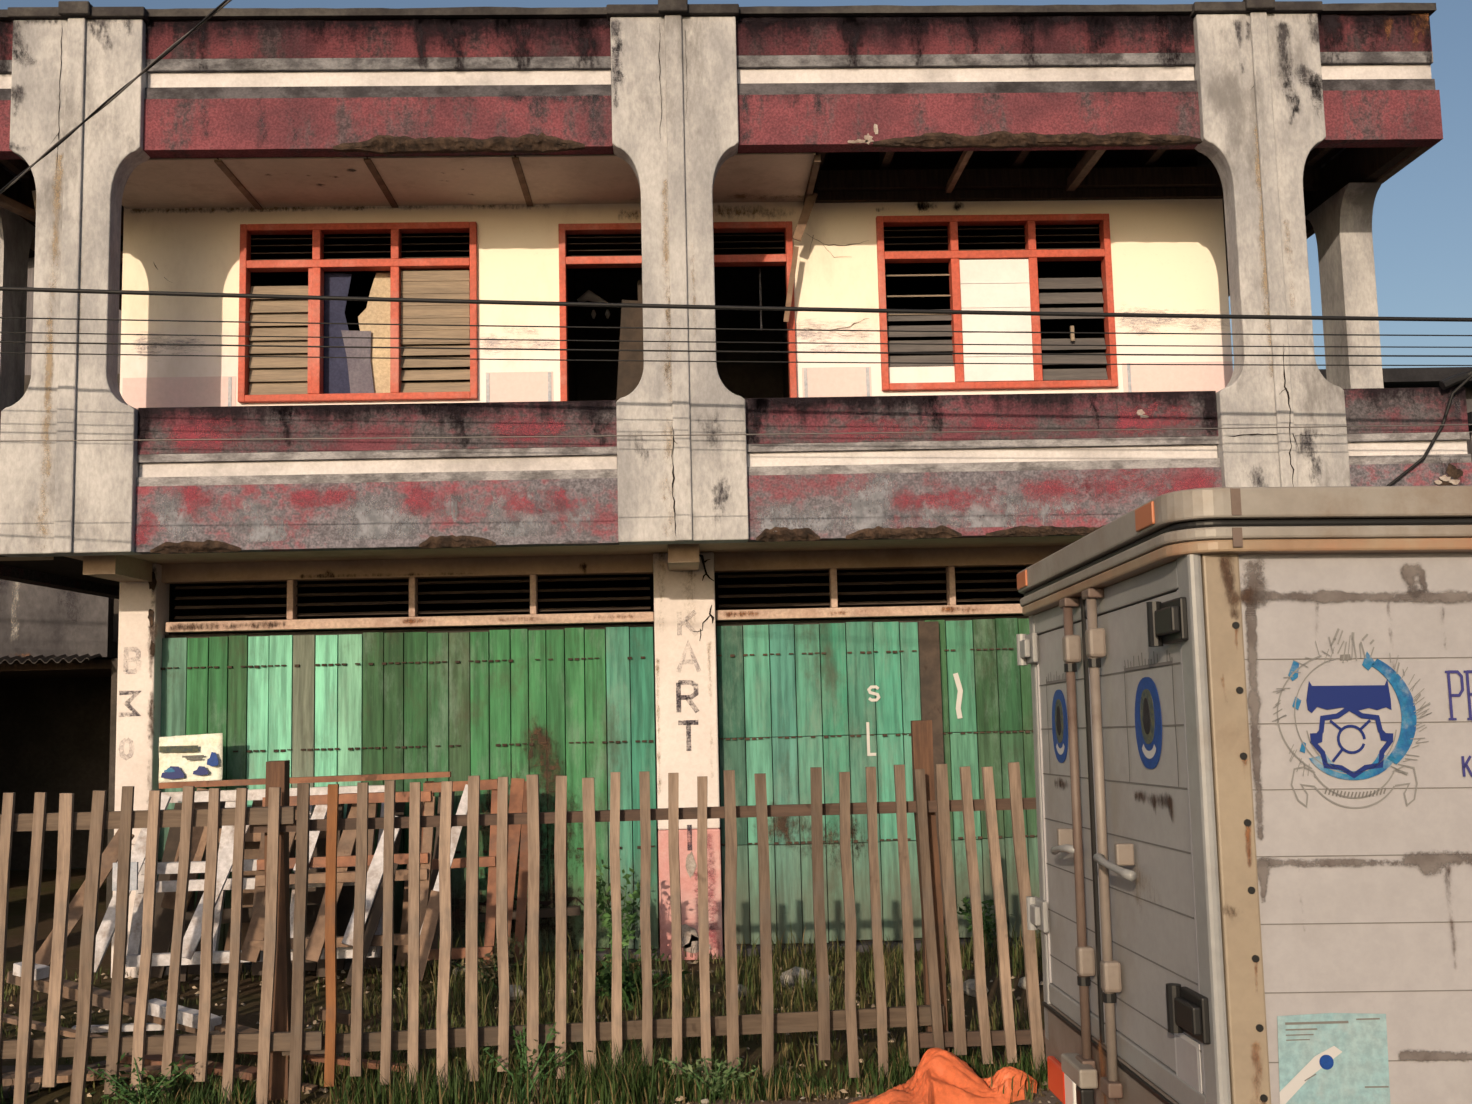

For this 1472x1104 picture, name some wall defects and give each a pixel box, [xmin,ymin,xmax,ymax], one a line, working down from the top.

crack [658,23,687,139]
leakage [1277,23,1322,124]
leakage [1310,13,1343,64]
leakage [44,319,53,474]
crack [1230,345,1351,487]
flaking render [143,493,287,677]
flaking render [340,491,593,548]
crack [671,427,714,641]
flaking render [756,474,1105,542]